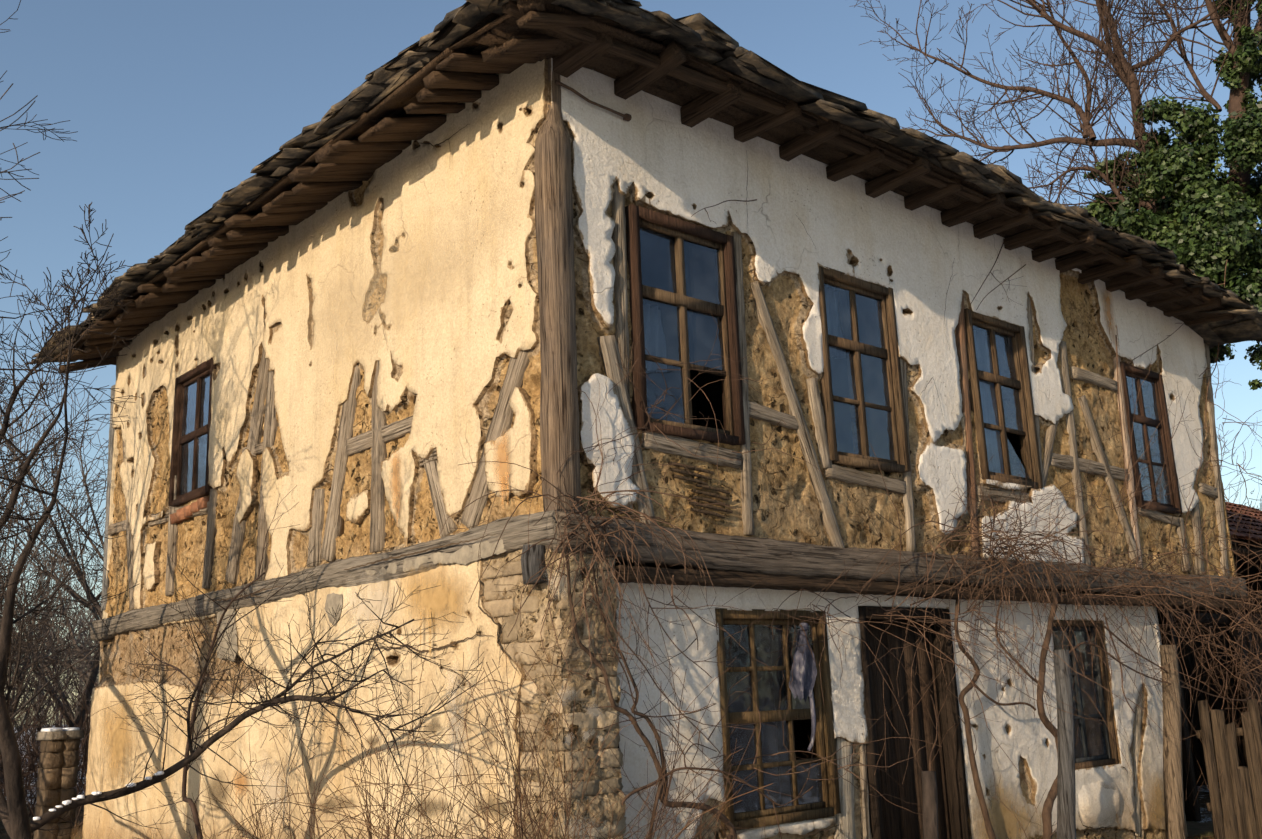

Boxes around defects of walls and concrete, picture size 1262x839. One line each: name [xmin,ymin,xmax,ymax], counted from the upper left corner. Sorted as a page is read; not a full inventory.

spalling [289,199,544,573]
spalling [572,185,1232,577]
spalling [105,366,289,618]
spalling [96,617,264,698]
spalling [695,798,836,839]
spalling [853,743,872,839]
spalling [1019,758,1032,803]